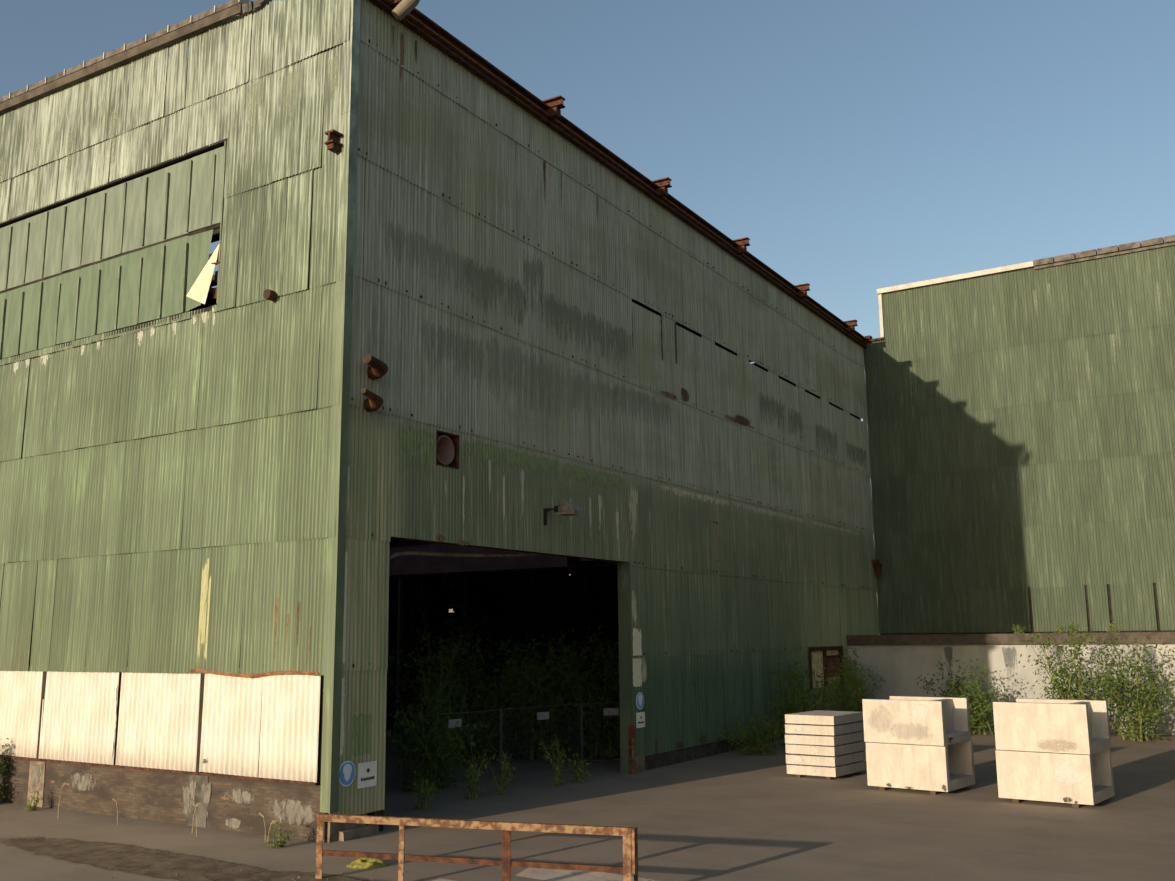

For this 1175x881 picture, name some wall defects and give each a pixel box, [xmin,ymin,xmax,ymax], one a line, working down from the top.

corrosion [392,25,417,79]
corrosion [660,388,689,401]
corrosion [725,415,750,427]